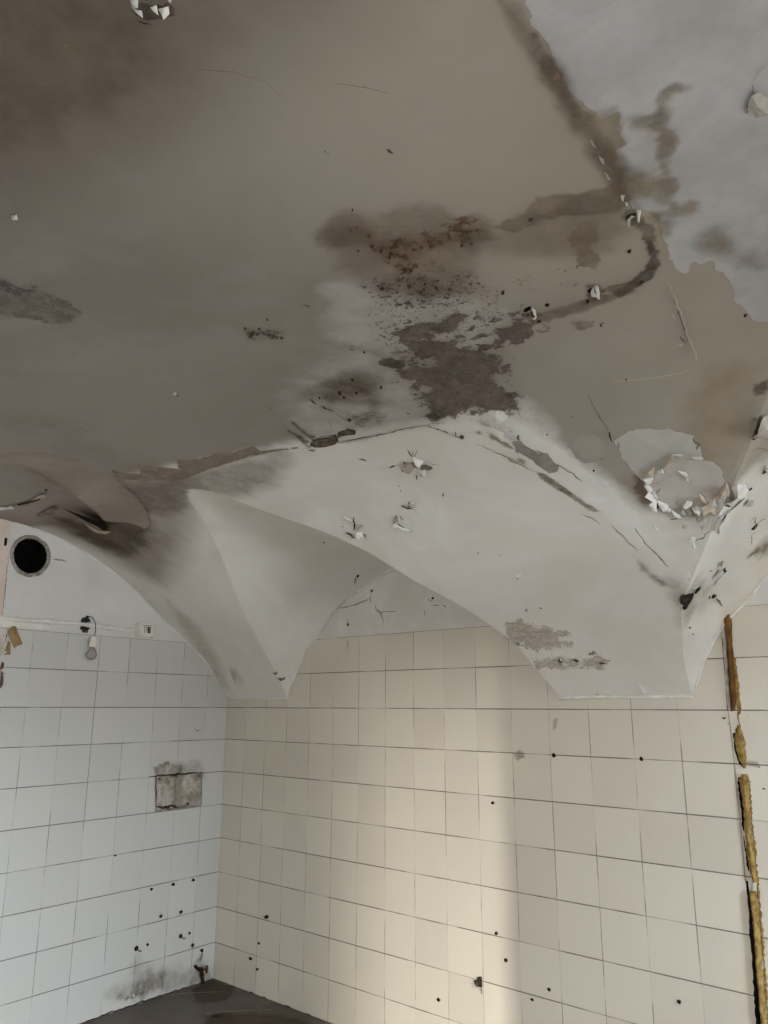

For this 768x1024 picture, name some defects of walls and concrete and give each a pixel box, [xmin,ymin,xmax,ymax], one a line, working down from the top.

peeling [130,0,175,26]
damp [541,57,673,202]
mould [361,275,500,322]
damp [532,283,631,330]
damp [318,375,383,403]
peeling [290,449,491,572]
peeling [567,428,755,549]
peeling [503,619,610,670]